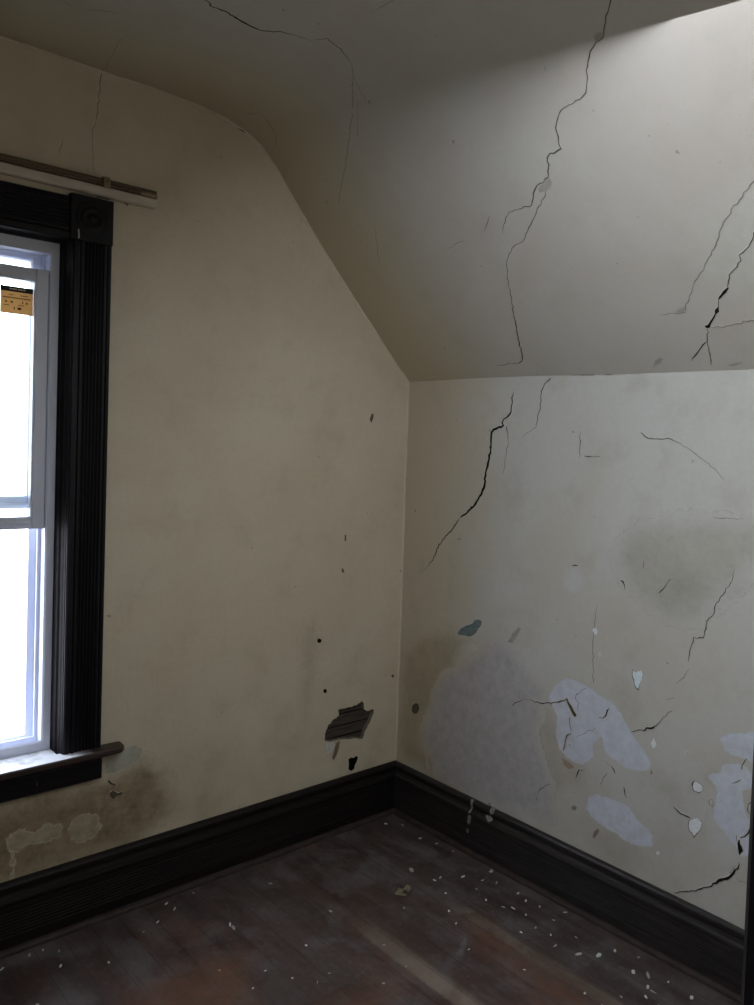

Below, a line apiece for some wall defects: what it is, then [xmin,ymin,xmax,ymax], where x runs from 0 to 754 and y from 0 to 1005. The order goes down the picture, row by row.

crack [205,0,366,202]
crack [484,0,613,367]
crack [665,181,754,365]
crack [422,378,551,572]
leakage [0,751,179,883]
spalling [325,701,374,754]
spalling [458,620,481,636]
peeling [411,638,657,827]
peeling [585,793,660,855]
crack [631,569,736,733]
crack [674,827,750,894]
peeling [688,730,754,870]